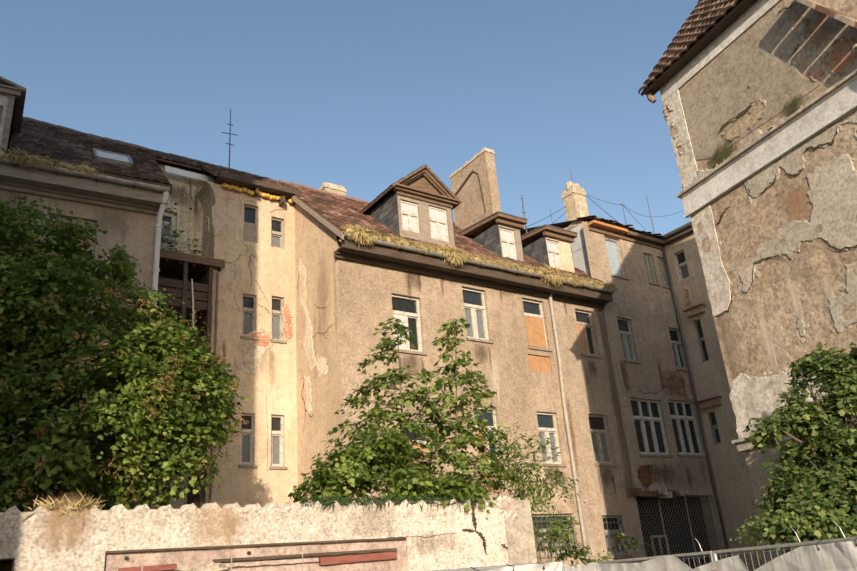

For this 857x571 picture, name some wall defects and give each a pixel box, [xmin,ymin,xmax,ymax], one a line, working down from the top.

peeling [663,8,857,190]
peeling [201,184,288,253]
peeling [691,112,857,317]
peeling [212,244,258,313]
crack [226,246,270,314]
peeling [828,263,857,333]
flaking render [235,303,293,375]
peeling [298,255,328,414]
peeling [729,367,836,439]
spalling [637,465,654,488]
crack [387,500,508,555]